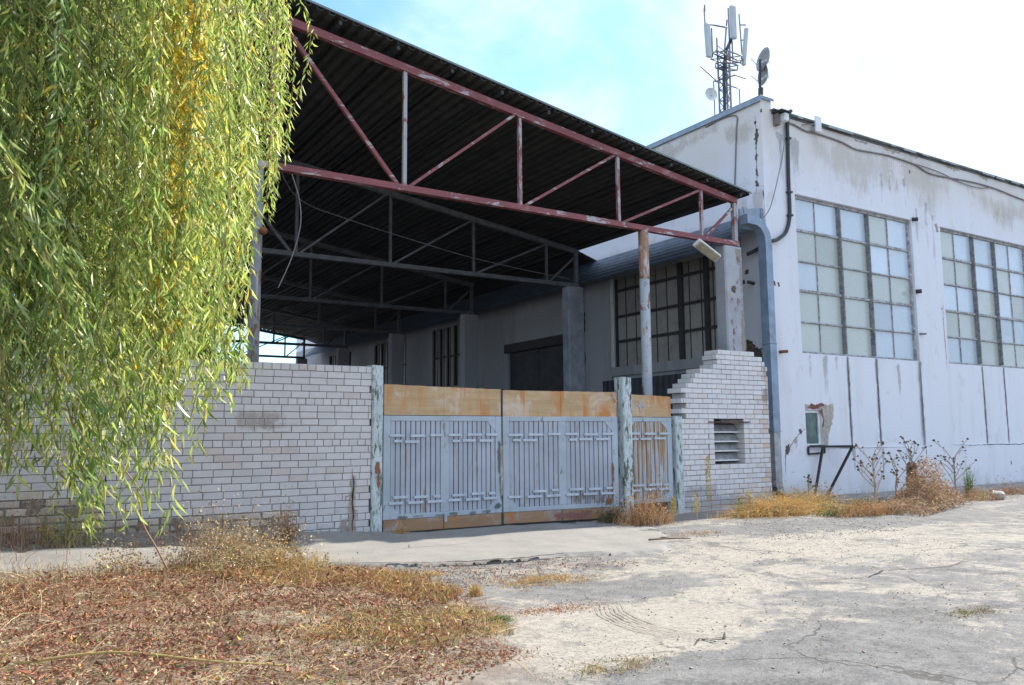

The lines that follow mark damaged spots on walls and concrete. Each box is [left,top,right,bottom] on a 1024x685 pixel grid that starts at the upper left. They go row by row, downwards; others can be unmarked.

spalling [805,403,834,445]